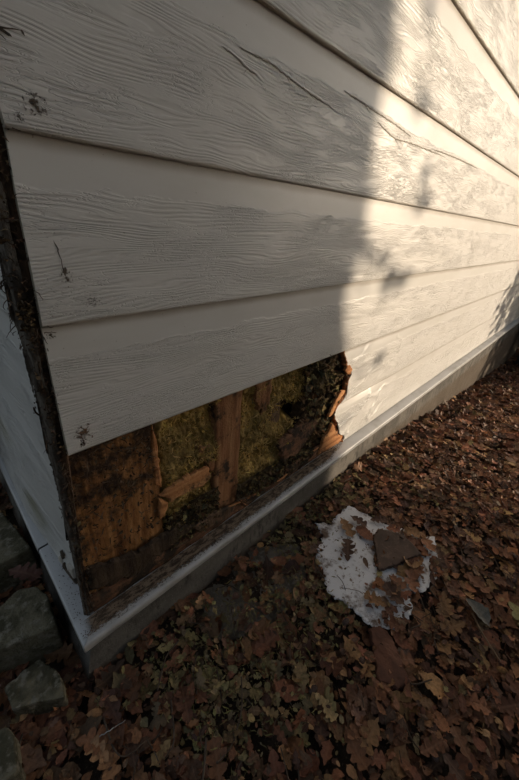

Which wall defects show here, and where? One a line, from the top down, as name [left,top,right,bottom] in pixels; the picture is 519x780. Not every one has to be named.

crack [222,46,334,110]
crack [344,90,478,169]
spalling [0,144,257,615]
spalling [251,379,272,415]
spalling [275,351,352,482]